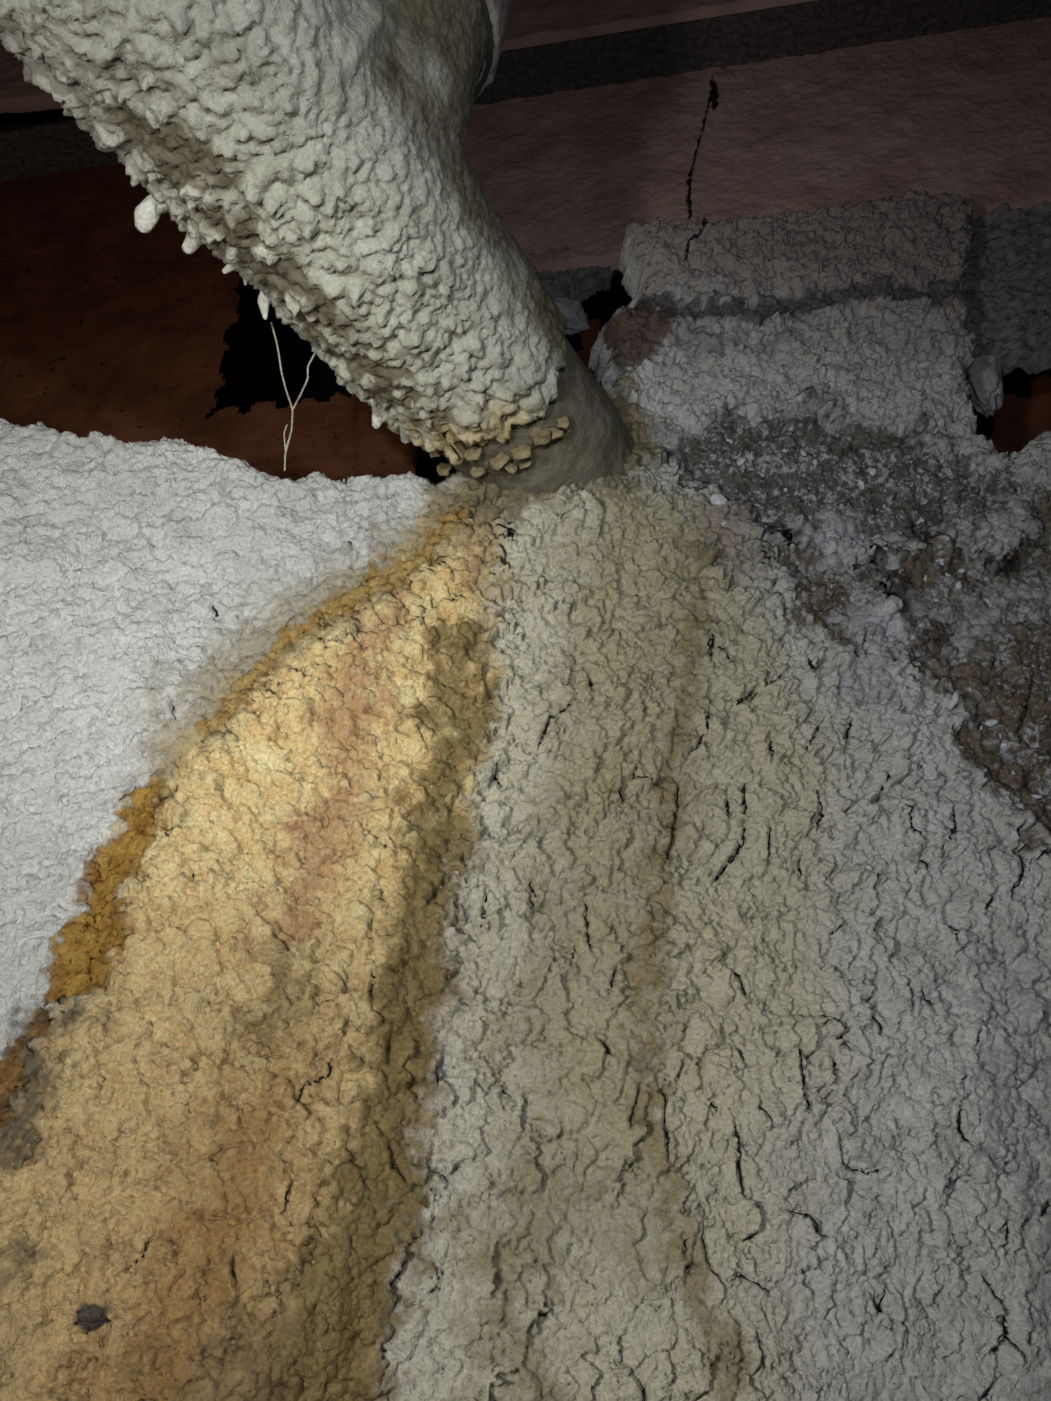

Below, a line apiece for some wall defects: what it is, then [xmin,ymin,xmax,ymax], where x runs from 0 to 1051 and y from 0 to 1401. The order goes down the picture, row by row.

crack [684,75,719,260]
crack [537,679,593,750]
crack [688,633,815,754]
crack [619,767,681,863]
crack [714,783,802,881]
crack [877,773,958,871]
crack [986,829,1051,909]
damp [0,470,558,1401]
crack [630,1063,684,1161]
crack [710,1103,773,1198]
crack [799,1015,882,1111]
crack [980,1276,1027,1400]